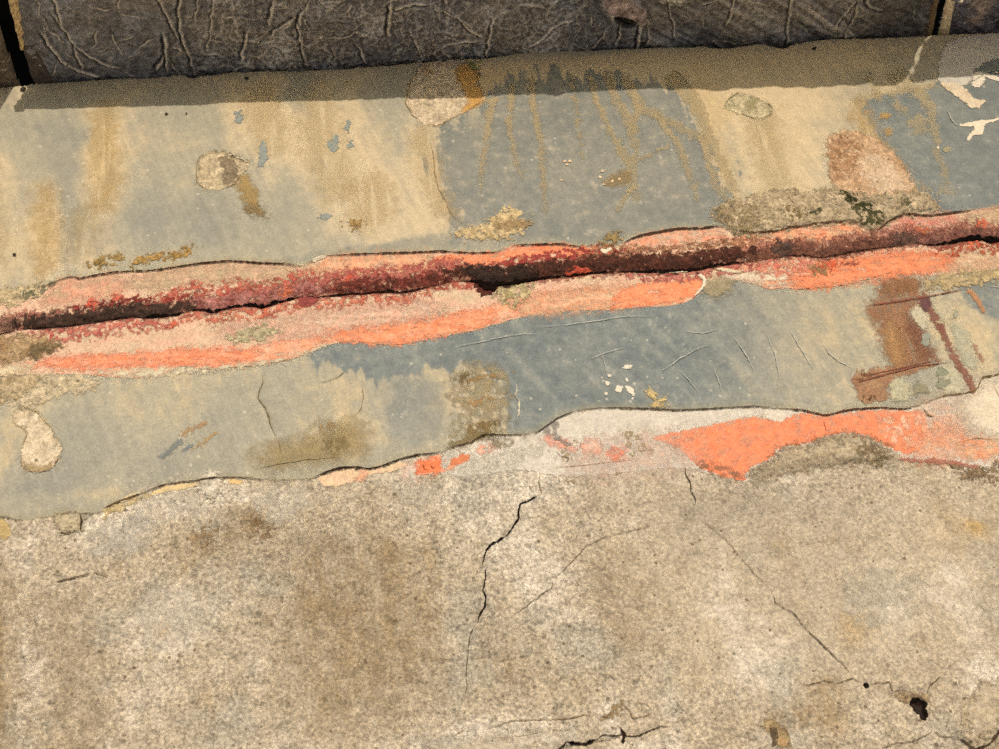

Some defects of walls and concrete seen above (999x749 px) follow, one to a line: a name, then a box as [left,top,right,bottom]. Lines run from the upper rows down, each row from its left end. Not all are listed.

spalling [405,60,488,127]
leakage [585,69,691,203]
leakage [664,70,719,181]
peeling [937,33,999,108]
peeling [947,110,999,140]
leakage [237,175,266,216]
crack [623,209,999,258]
crack [0,285,433,335]
crack [459,261,752,290]
corrosion [851,277,985,404]
peeling [318,364,999,488]
crack [464,475,542,701]